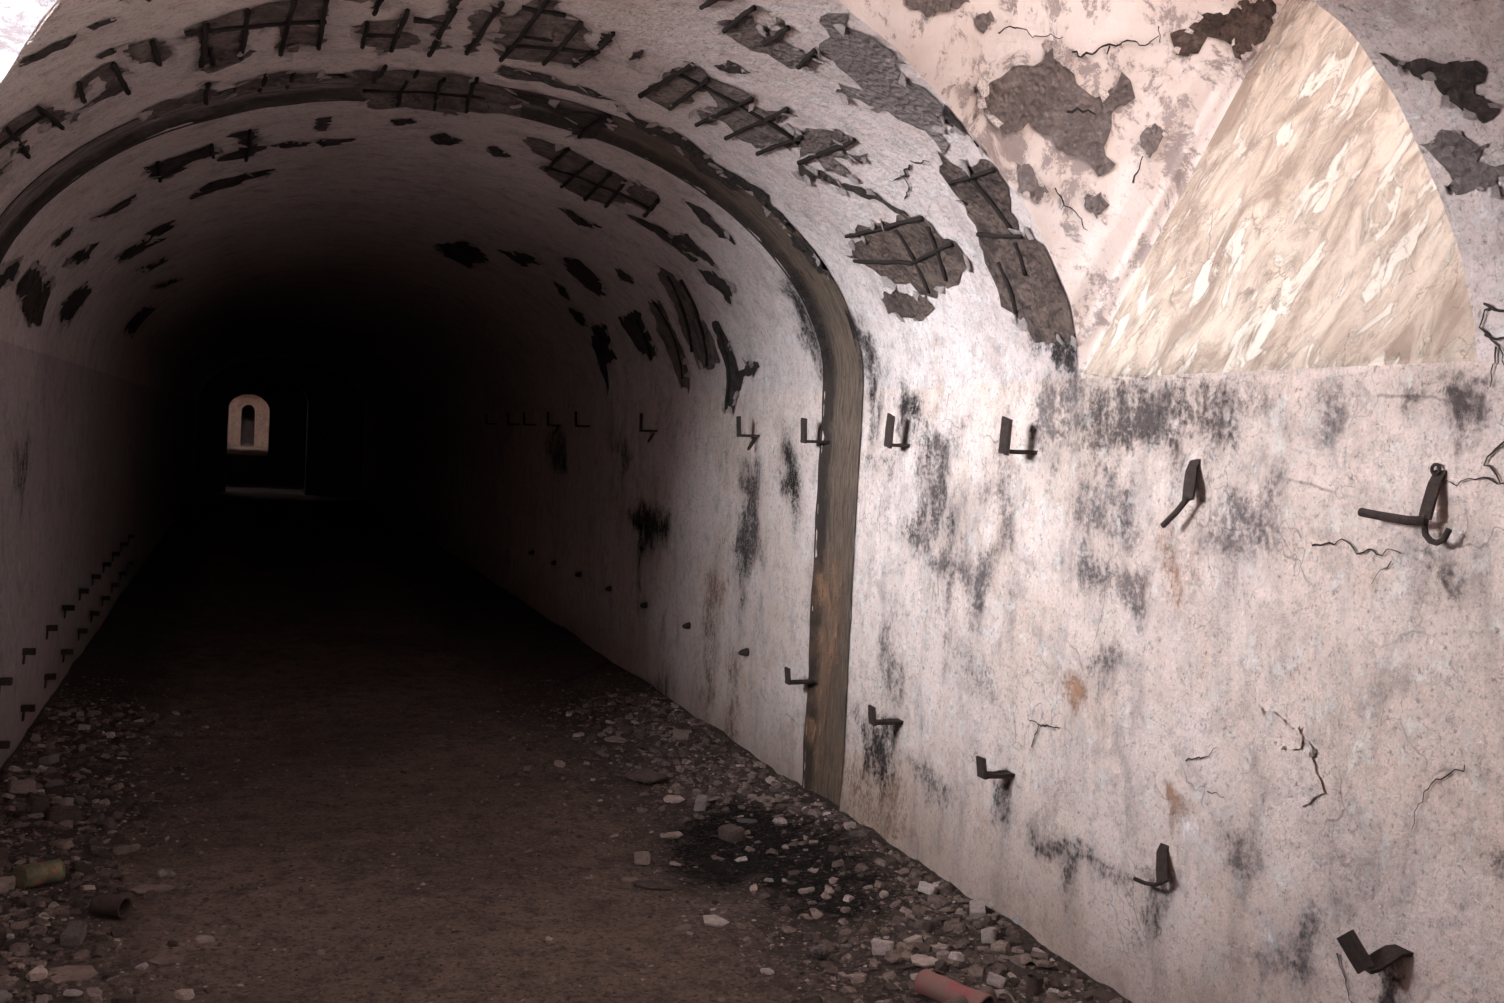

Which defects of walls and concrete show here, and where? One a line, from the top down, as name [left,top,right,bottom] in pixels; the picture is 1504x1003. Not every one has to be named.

spalling [1170,0,1276,61]
flaking render [973,39,1135,219]
spalling [1379,53,1504,199]
spalling [0,0,1078,414]
leakage [781,269,831,379]
crack [1479,302,1504,387]
leakage [845,311,1014,630]
leakage [1030,334,1266,618]
crack [1447,441,1504,486]